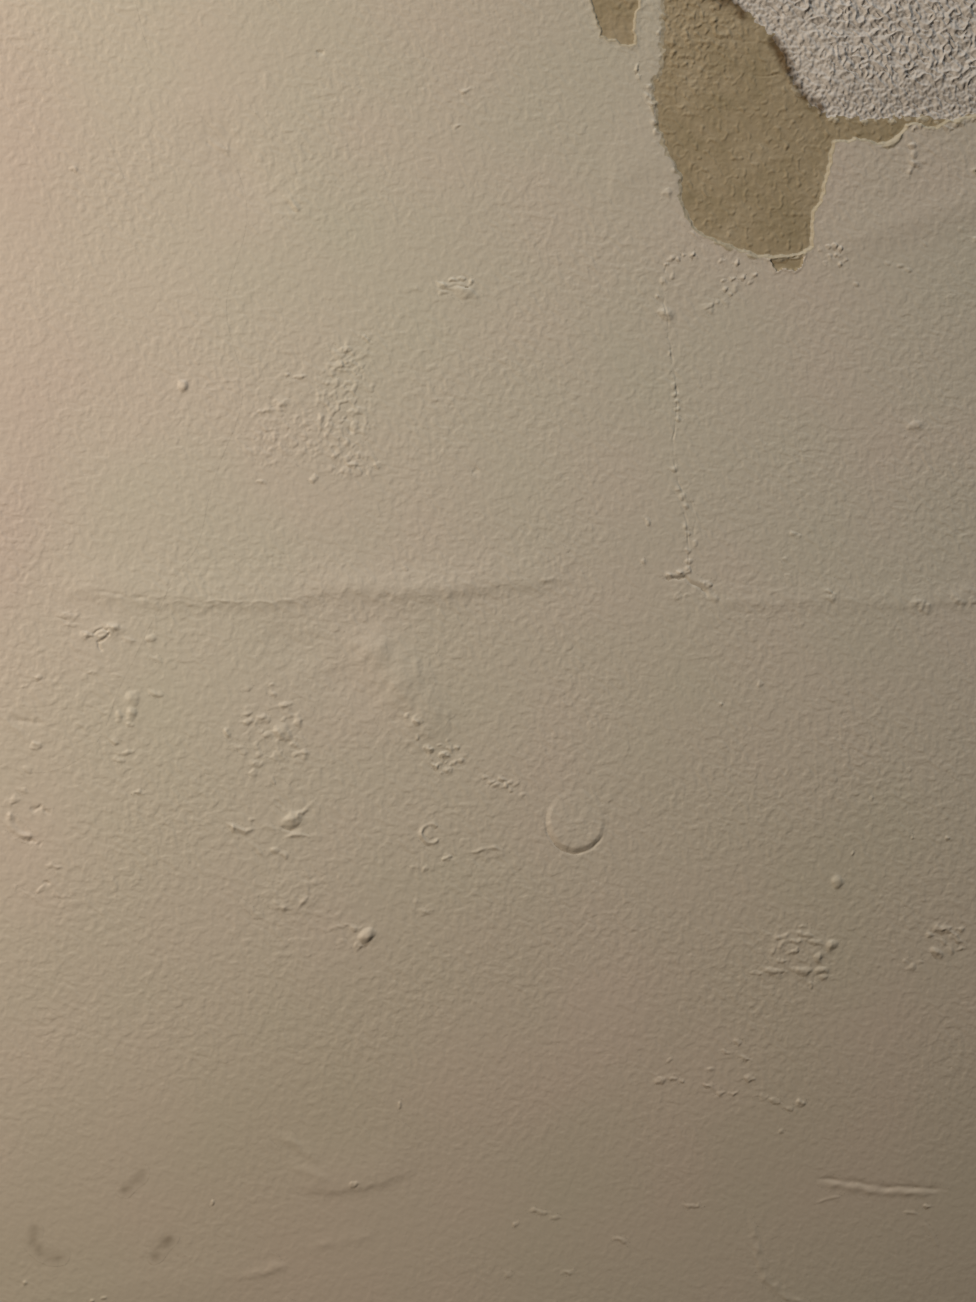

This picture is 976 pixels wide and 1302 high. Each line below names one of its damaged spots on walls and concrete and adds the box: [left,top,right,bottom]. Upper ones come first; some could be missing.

peeling [586,0,976,316]
crack [639,267,701,570]